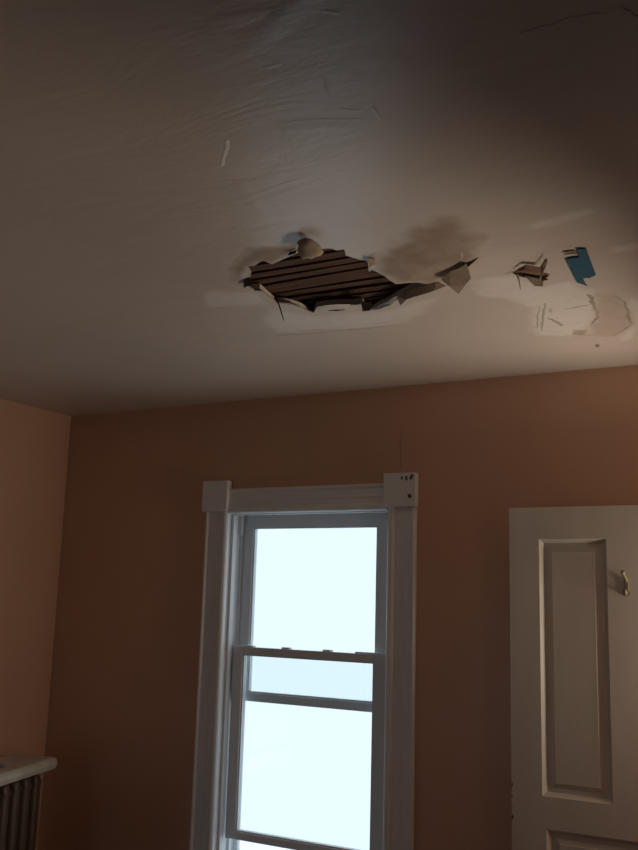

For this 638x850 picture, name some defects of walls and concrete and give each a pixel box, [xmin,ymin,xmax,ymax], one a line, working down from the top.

peeling [243,250,446,313]
peeling [466,274,638,348]